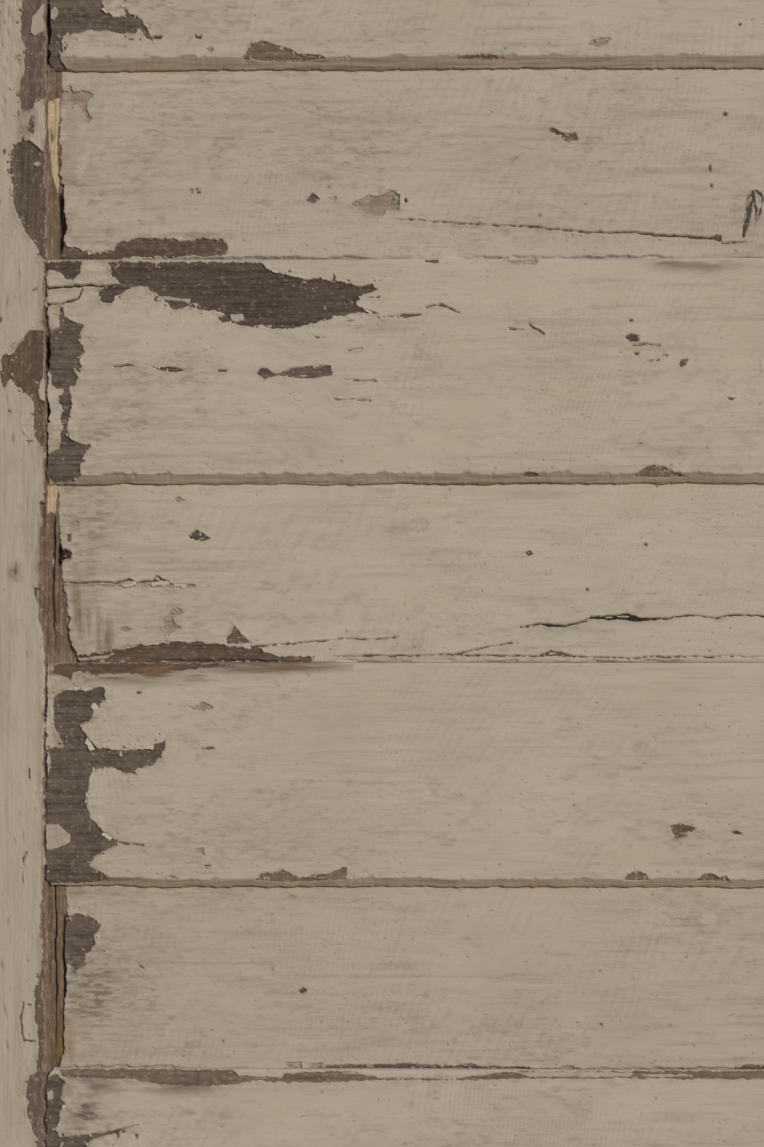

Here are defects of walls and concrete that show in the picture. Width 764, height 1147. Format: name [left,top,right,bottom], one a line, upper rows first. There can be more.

peeling [3,0,419,338]
crack [400,191,763,244]
peeling [0,304,90,485]
peeling [257,366,332,379]
crack [251,614,764,659]
peeling [45,608,314,884]
peeling [64,907,104,973]